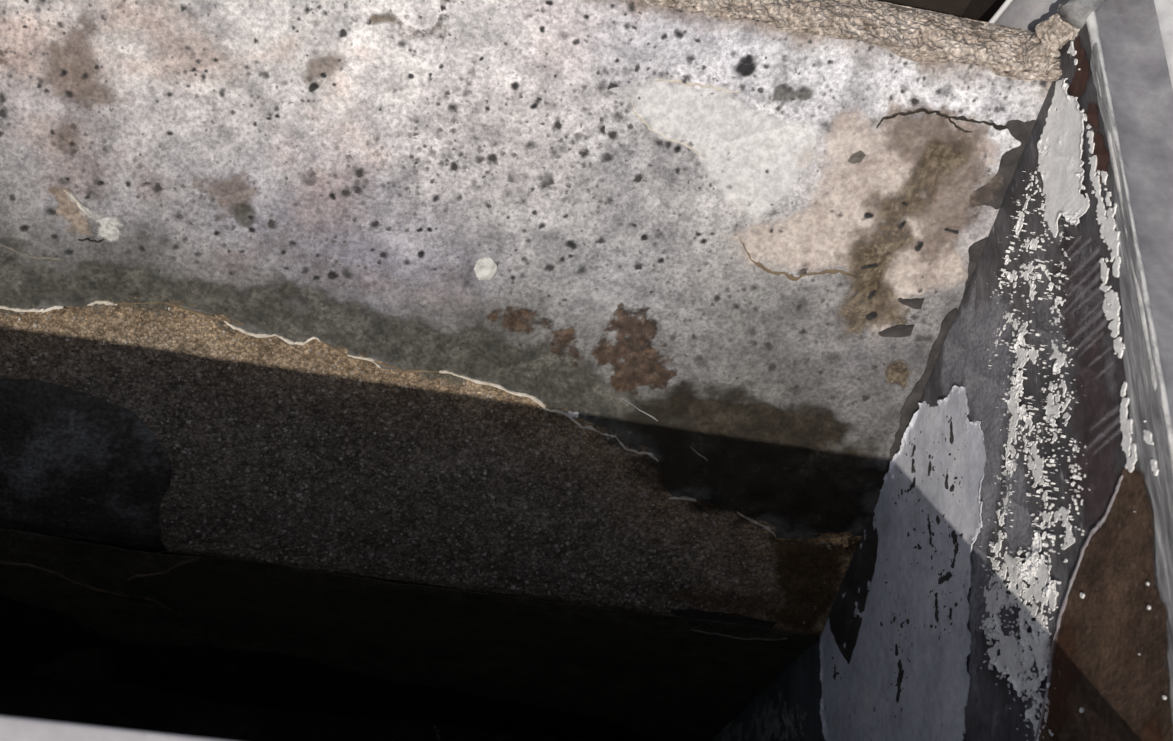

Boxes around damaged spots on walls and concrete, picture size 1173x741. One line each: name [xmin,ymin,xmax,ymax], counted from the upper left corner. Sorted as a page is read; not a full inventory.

spalling [627,0,1125,358]
crack [876,108,1008,133]
rust [1069,36,1109,181]
leakage [0,243,888,534]
spalling [0,297,1123,741]
rust [486,304,676,394]
rust [1039,232,1173,741]
peeling [1120,382,1137,473]
peeling [1143,420,1154,445]